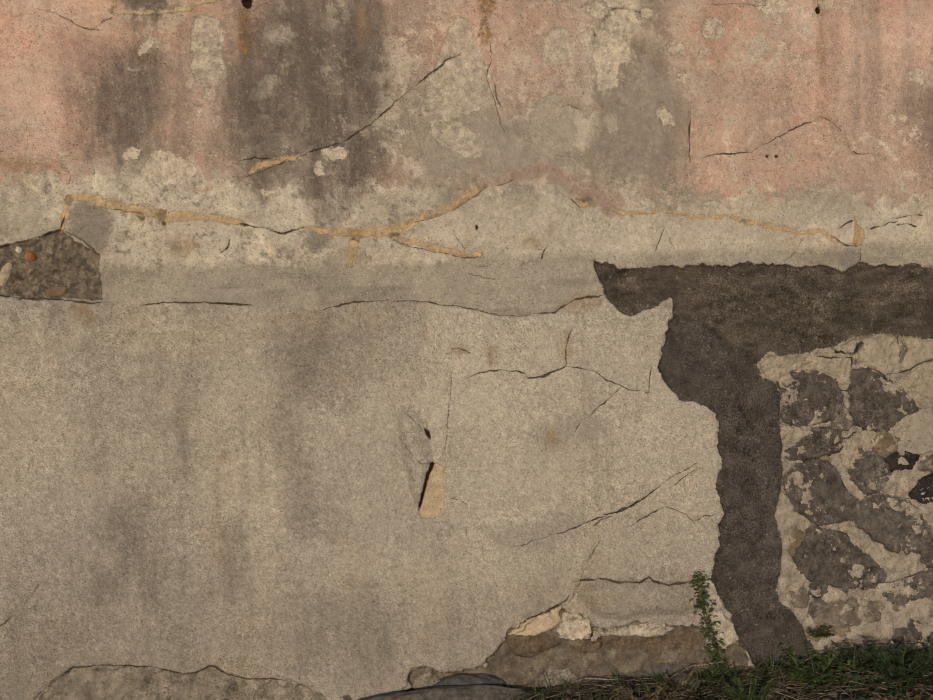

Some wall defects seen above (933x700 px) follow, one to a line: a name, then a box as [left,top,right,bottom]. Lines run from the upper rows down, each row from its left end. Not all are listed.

crack [241,53,461,176]
crack [688,117,841,158]
spalling [0,229,103,301]
crack [222,223,304,252]
crack [145,299,249,307]
crack [323,295,602,316]
crack [461,330,653,433]
flaking render [405,261,933,691]
crack [510,463,720,630]
spalling [39,665,326,700]